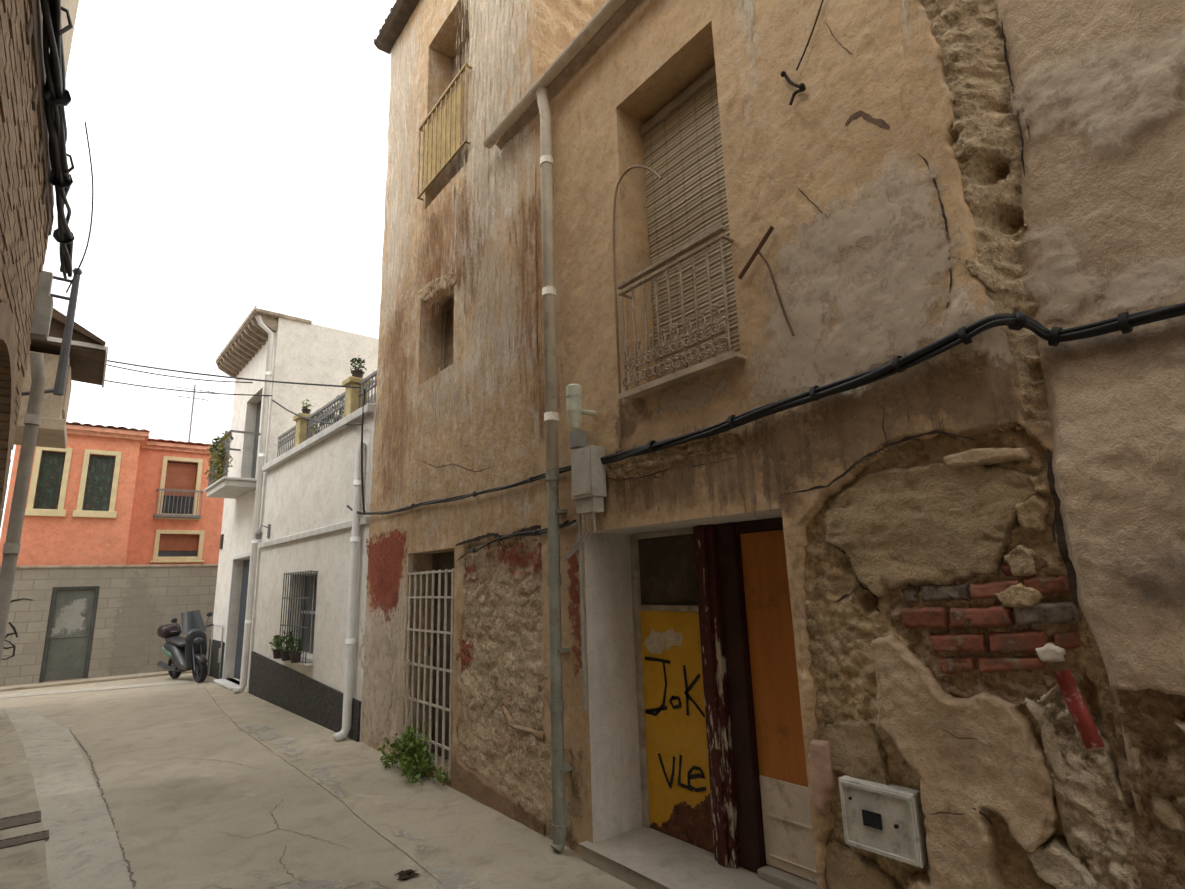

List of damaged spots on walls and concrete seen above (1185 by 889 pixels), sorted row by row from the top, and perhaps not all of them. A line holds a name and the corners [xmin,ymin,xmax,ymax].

damp [377,0,560,502]
spalling [803,0,1185,889]
flaking render [456,529,550,737]
crack [70,729,137,889]
crack [216,799,388,889]